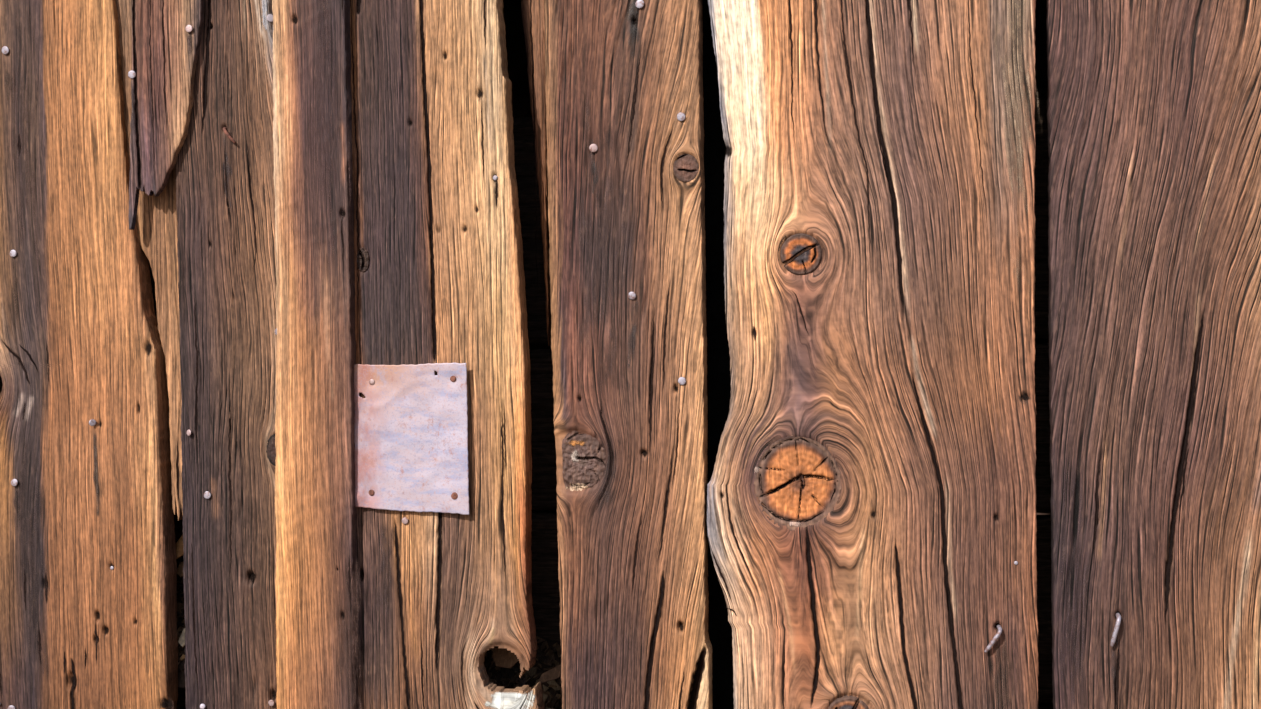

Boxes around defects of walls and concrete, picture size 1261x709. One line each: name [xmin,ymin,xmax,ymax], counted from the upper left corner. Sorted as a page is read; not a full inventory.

crack [133,0,167,189]
crack [788,0,904,311]
crack [632,283,680,709]
crack [679,647,706,709]
crack [894,542,917,709]
crack [911,373,963,709]
crack [1164,313,1203,619]